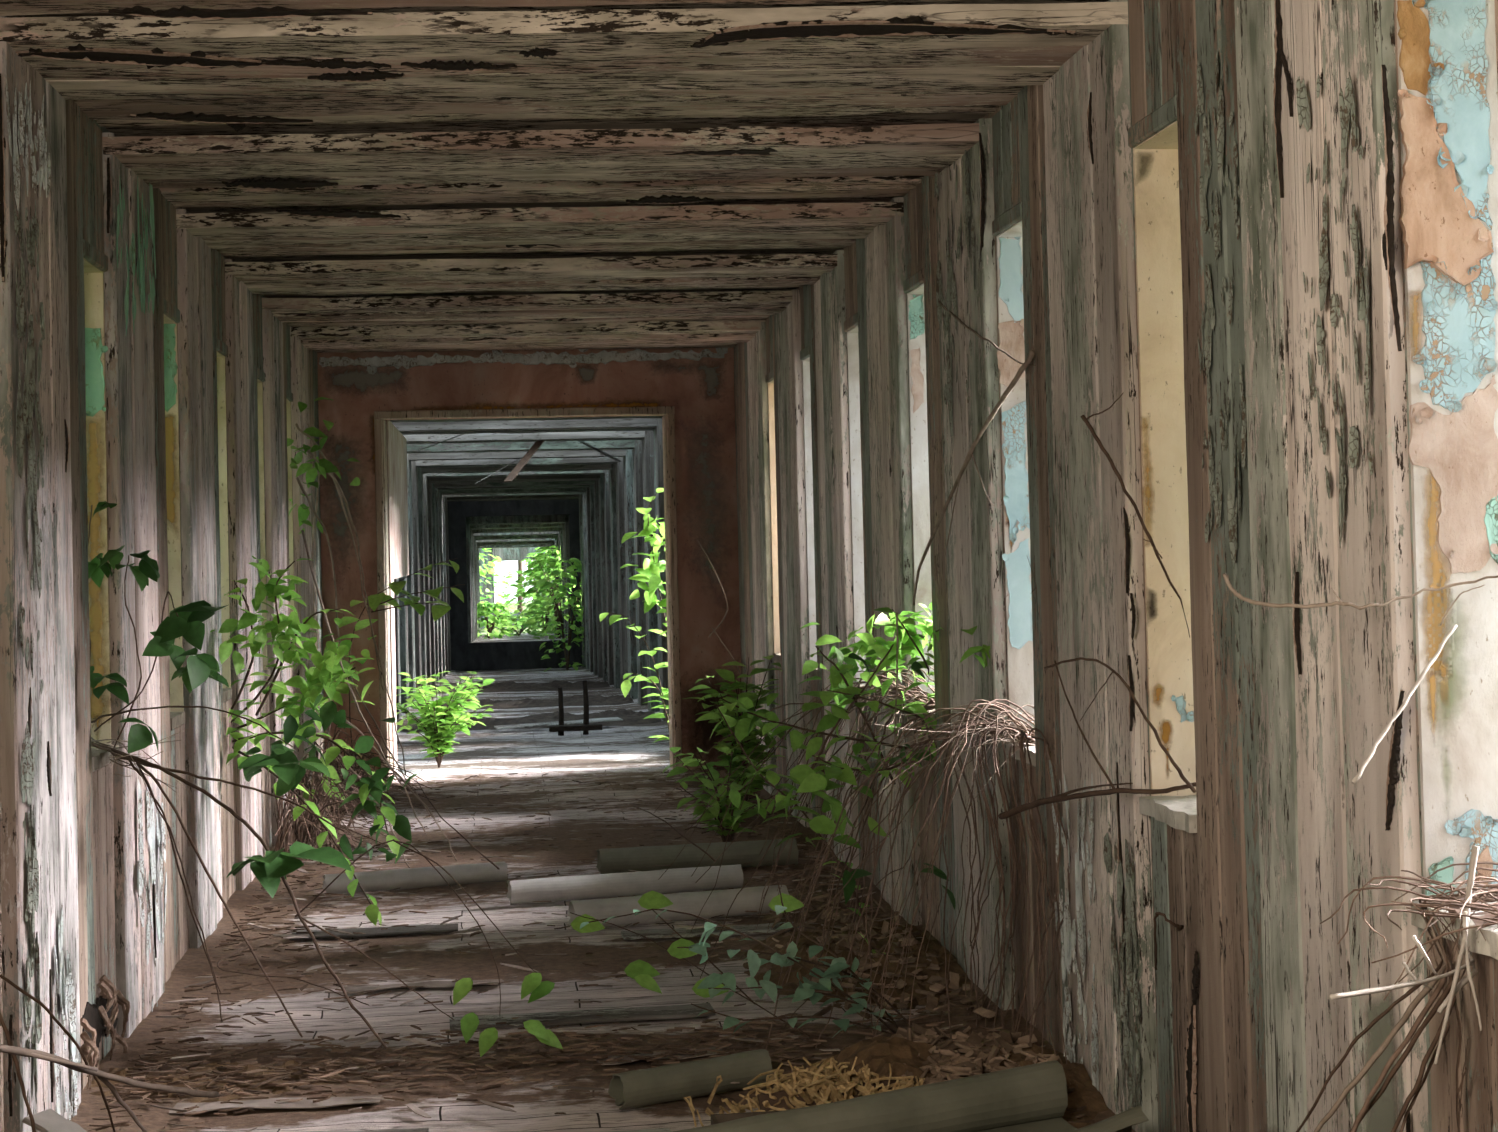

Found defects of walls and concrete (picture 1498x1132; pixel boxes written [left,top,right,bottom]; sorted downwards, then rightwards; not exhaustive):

crack [1273,0,1293,198]
flaking render [1397,0,1498,574]
peeling [1425,809,1498,897]